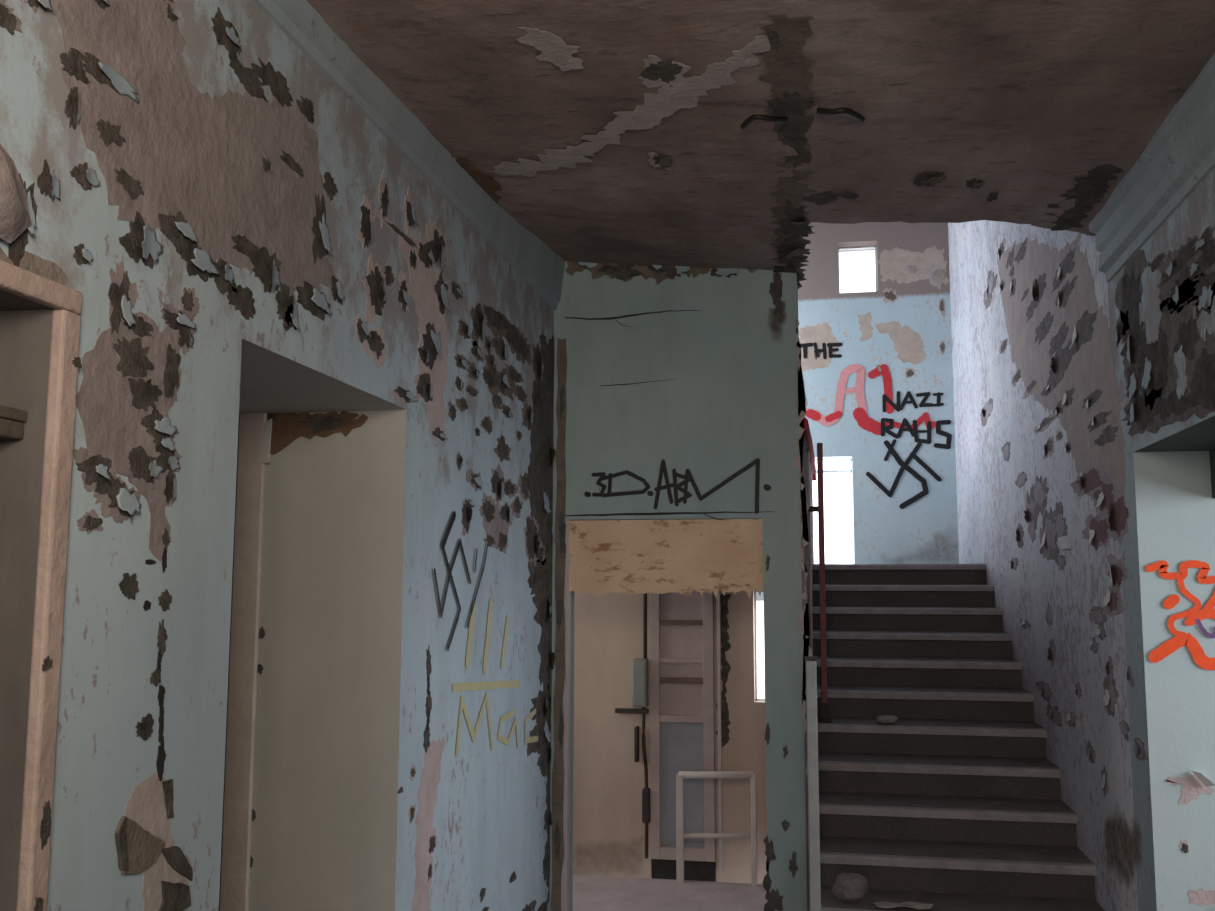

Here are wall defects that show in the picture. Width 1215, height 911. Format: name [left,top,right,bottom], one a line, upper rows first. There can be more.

flaking render [451,14,823,289]
peeling [0,0,345,562]
crack [565,310,700,327]
crack [601,378,672,386]
peeling [858,311,946,379]
peeling [878,246,949,317]
flaking render [258,411,368,464]
peeling [983,164,1215,761]
peeling [354,169,567,911]
spalling [40,800,51,850]
peeling [115,772,193,911]
flaking render [763,835,798,911]